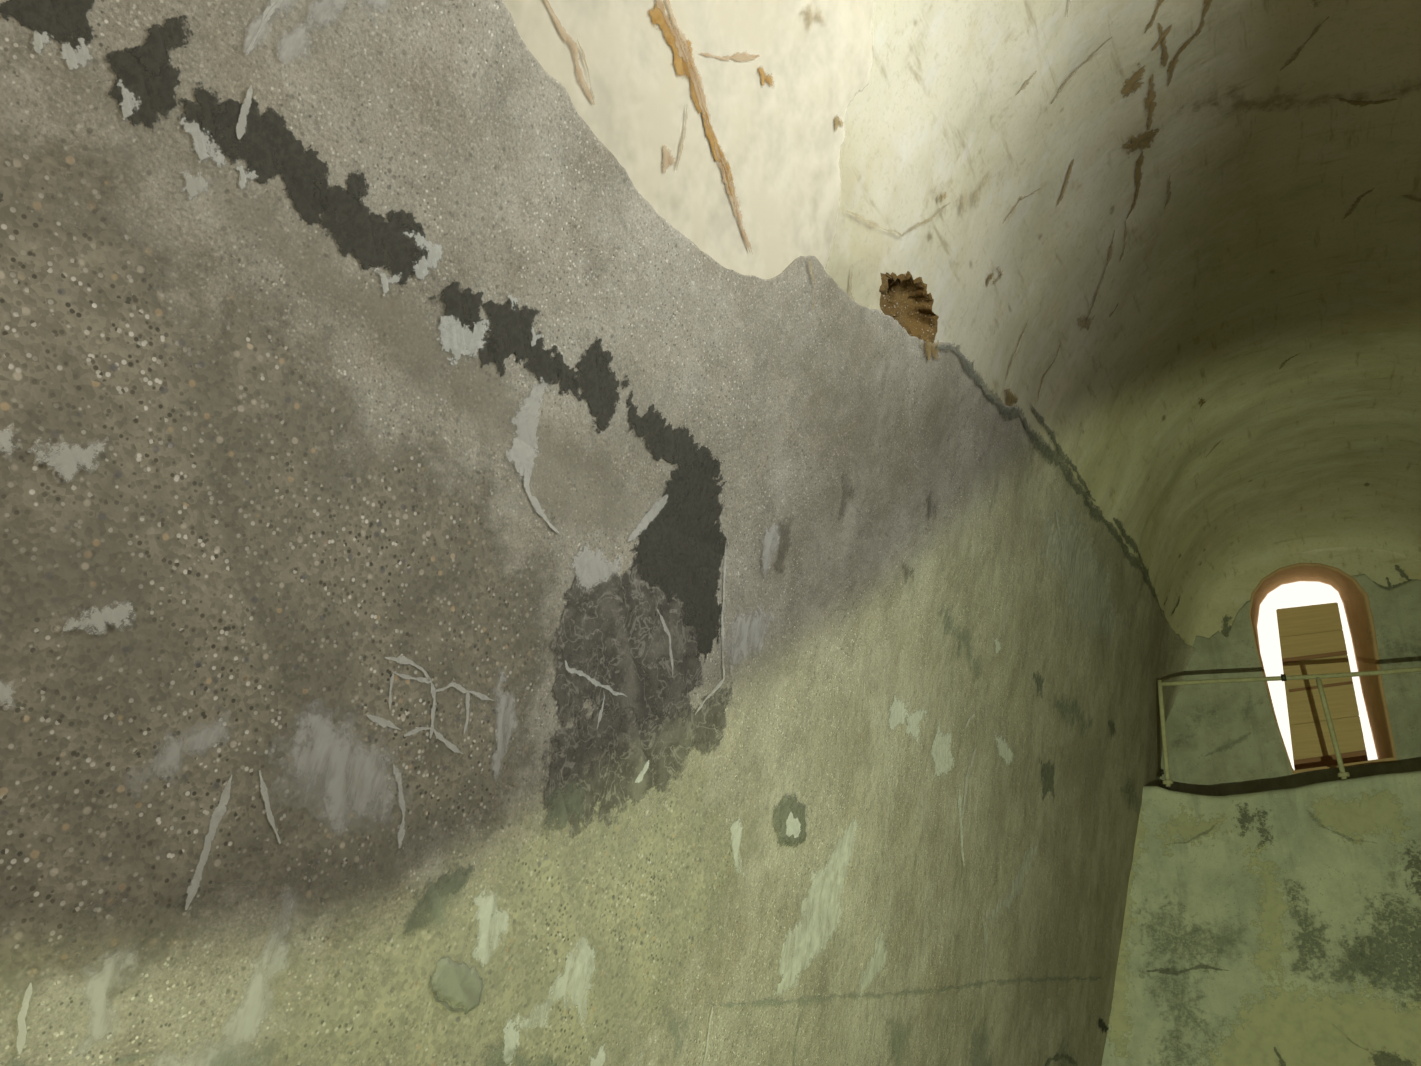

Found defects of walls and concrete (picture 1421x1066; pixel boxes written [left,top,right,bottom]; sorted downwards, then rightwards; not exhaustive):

rust [544,0,595,105]
flaking render [502,0,875,279]
rust [649,0,774,252]
spalling [879,271,939,343]
crack [987,266,1003,287]
crack [1004,0,1212,397]
flaking render [0,136,549,991]
flaking render [773,794,807,847]
mould [1236,803,1273,846]
mould [1286,840,1421,1007]